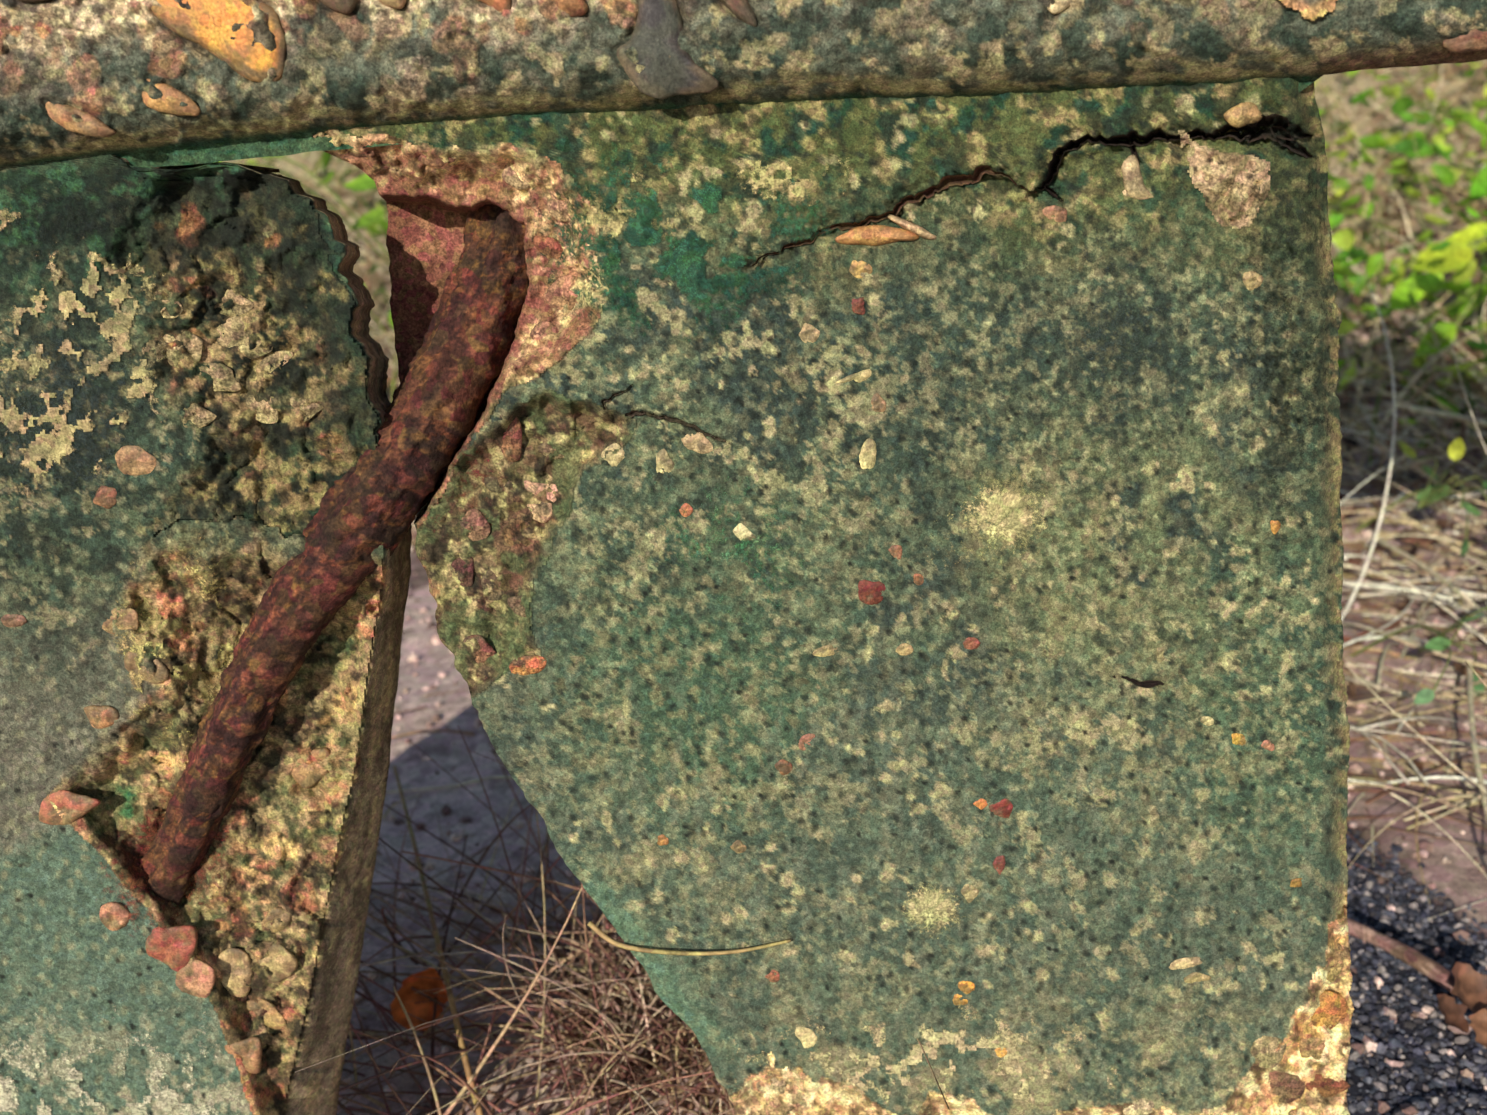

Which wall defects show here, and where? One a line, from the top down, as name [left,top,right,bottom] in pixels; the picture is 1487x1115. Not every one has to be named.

rust [106,793,233,930]
spalling [0,177,383,1115]
spalling [313,129,636,698]
crack [752,113,1316,267]